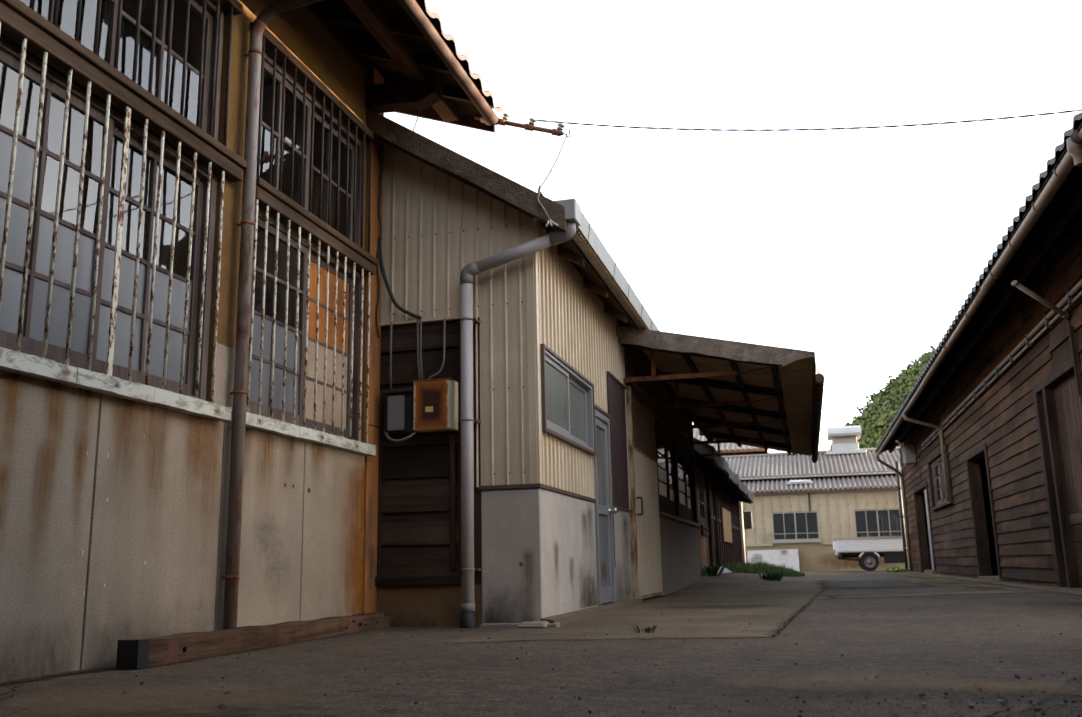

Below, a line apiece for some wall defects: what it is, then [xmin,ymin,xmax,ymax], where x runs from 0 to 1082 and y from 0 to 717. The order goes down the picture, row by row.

corrosion [50,369,70,432]
corrosion [117,399,147,440]